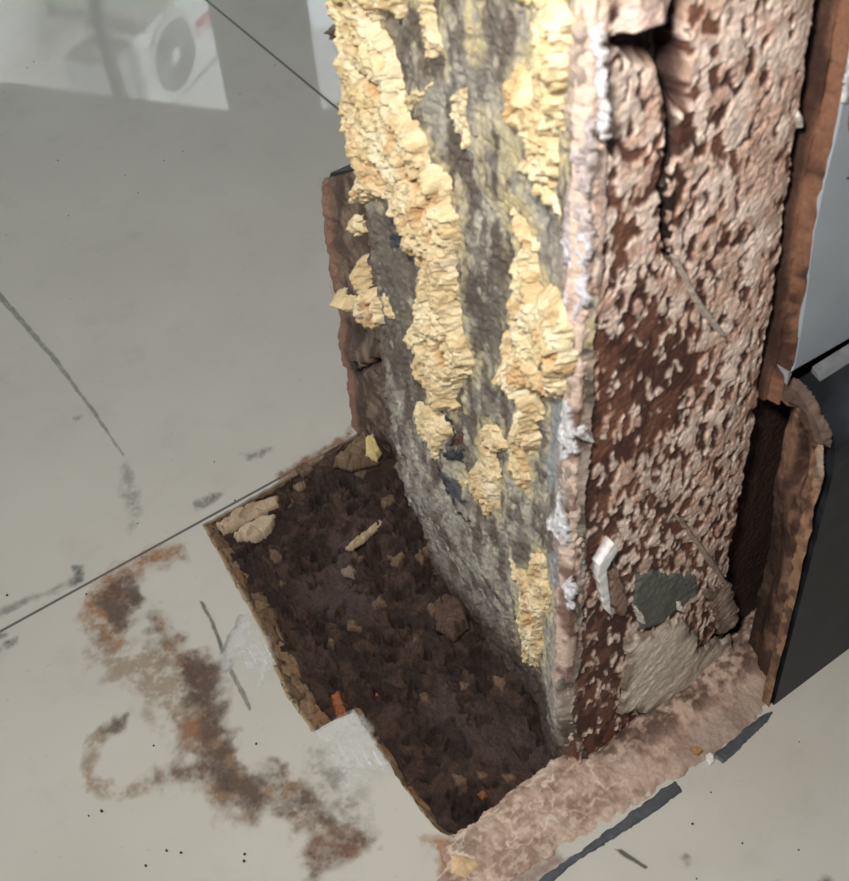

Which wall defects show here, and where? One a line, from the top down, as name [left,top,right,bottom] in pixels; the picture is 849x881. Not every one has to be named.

crack [647,9,673,60]
crack [655,104,676,256]
flaking render [363,0,833,763]
rust [86,548,178,649]
rust [153,617,367,877]
spalling [202,522,455,838]